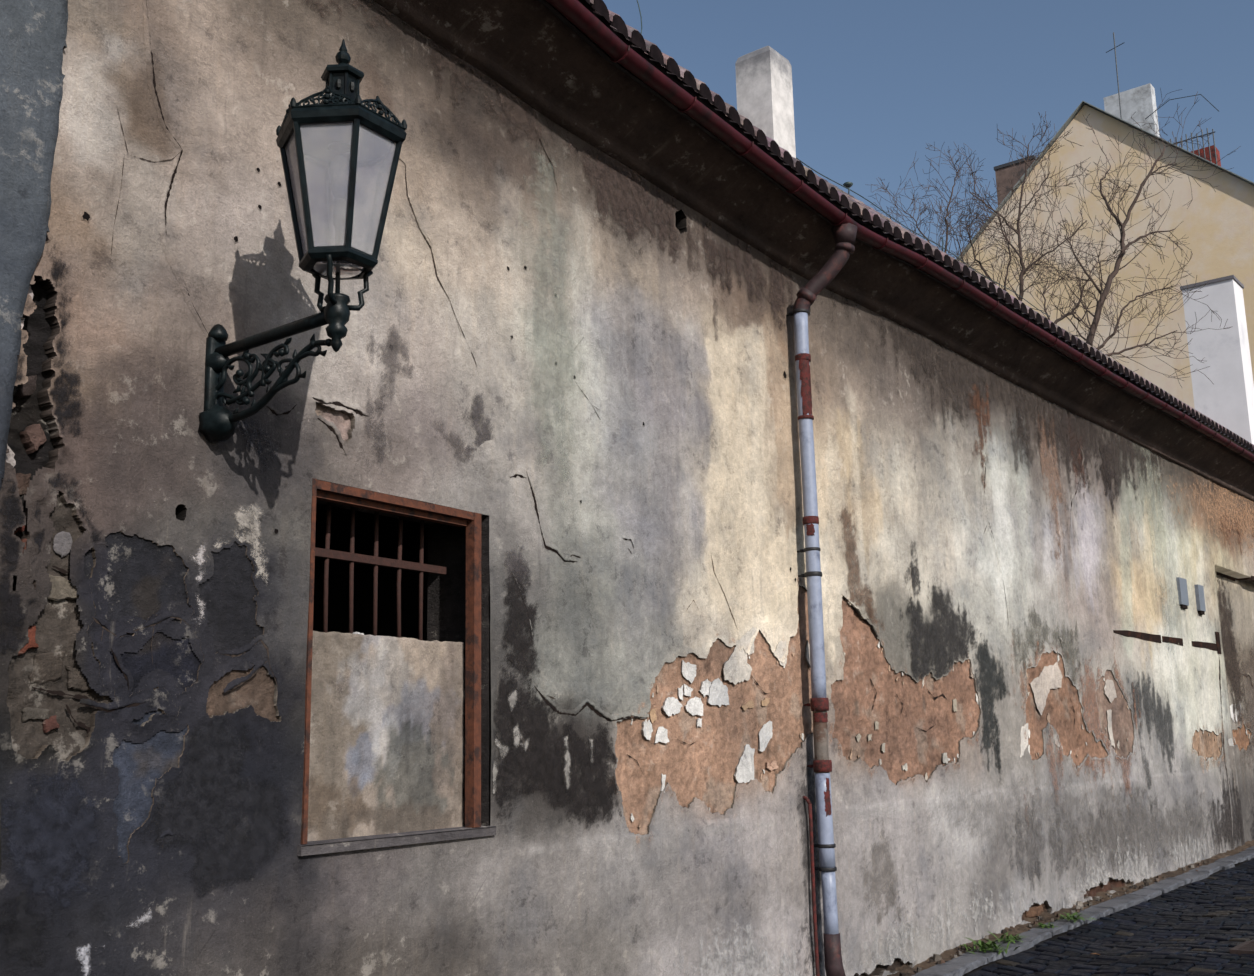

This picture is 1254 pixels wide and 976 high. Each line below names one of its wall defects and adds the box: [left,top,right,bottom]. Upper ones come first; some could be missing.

crack [110,0,208,337]
crack [399,156,477,367]
spalling [0,261,292,880]
crack [509,470,581,562]
peeling [493,726,530,794]
flaking render [608,566,984,847]
flaking render [1020,640,1138,778]
flaking render [1188,704,1254,771]
spalling [845,948,919,976]
spalling [1015,866,1142,925]